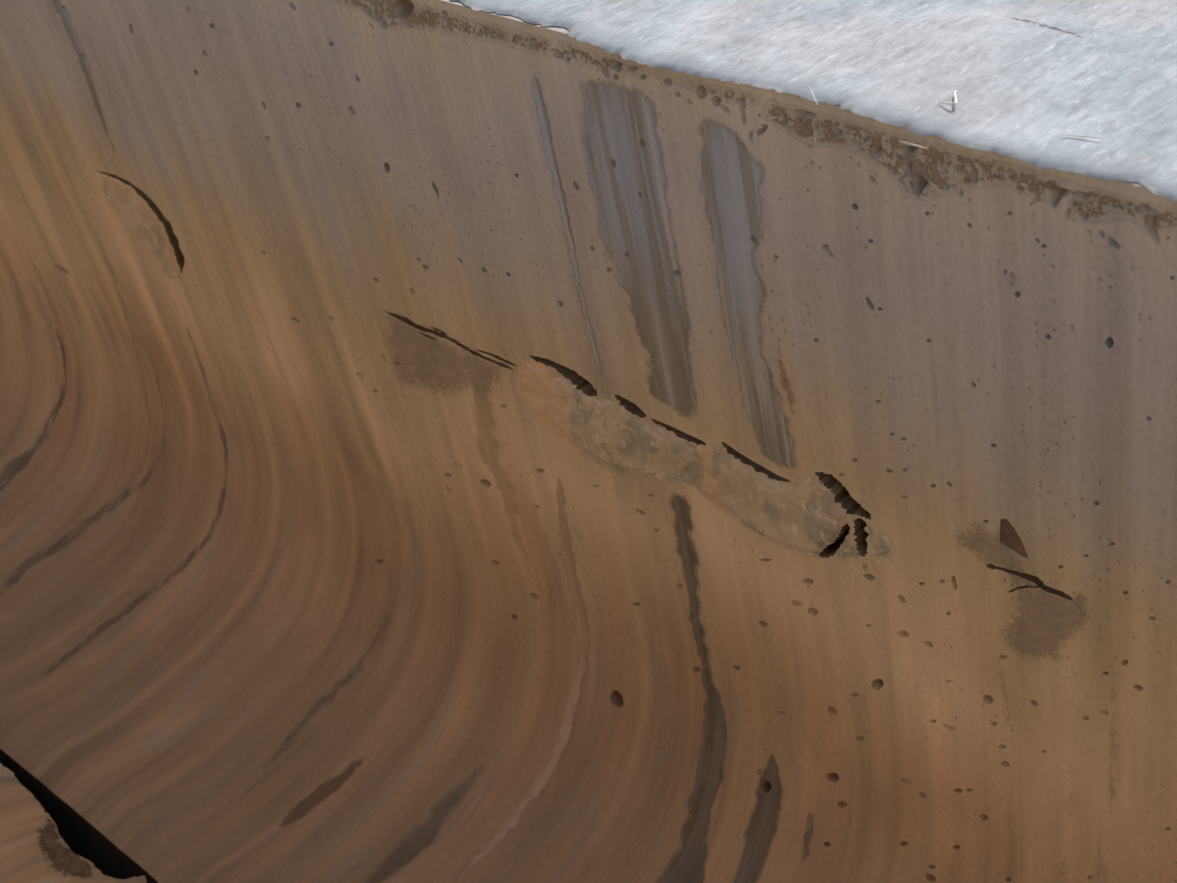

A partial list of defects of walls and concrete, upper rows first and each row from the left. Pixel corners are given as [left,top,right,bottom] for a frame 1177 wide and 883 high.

damp [532,77,601,375]
damp [582,82,696,416]
damp [700,121,795,468]
spalling [513,355,899,568]
spalling [1000,519,1028,558]
crack [986,564,1073,601]
damp [657,496,726,883]
crack [0,749,158,883]
damp [735,755,782,883]